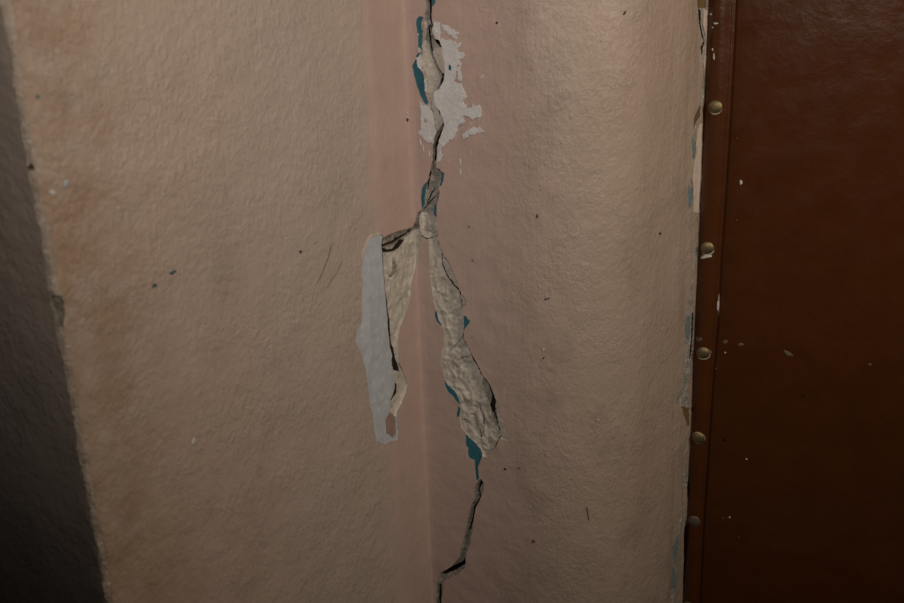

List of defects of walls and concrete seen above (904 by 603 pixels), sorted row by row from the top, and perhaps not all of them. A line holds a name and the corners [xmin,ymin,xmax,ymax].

peeling [413,16,431,108]
crack [416,0,445,222]
spalling [356,173,510,480]
crack [436,479,484,603]